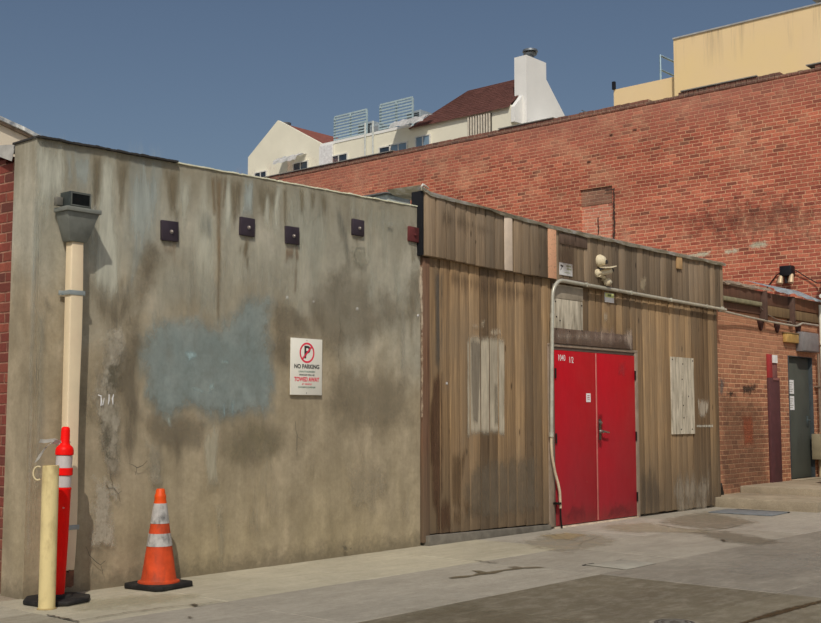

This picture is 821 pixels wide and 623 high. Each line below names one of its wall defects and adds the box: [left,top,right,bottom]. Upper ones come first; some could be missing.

water stain [37,144,64,213]
water stain [78,159,125,297]
water stain [169,173,188,209]
water stain [189,179,286,294]